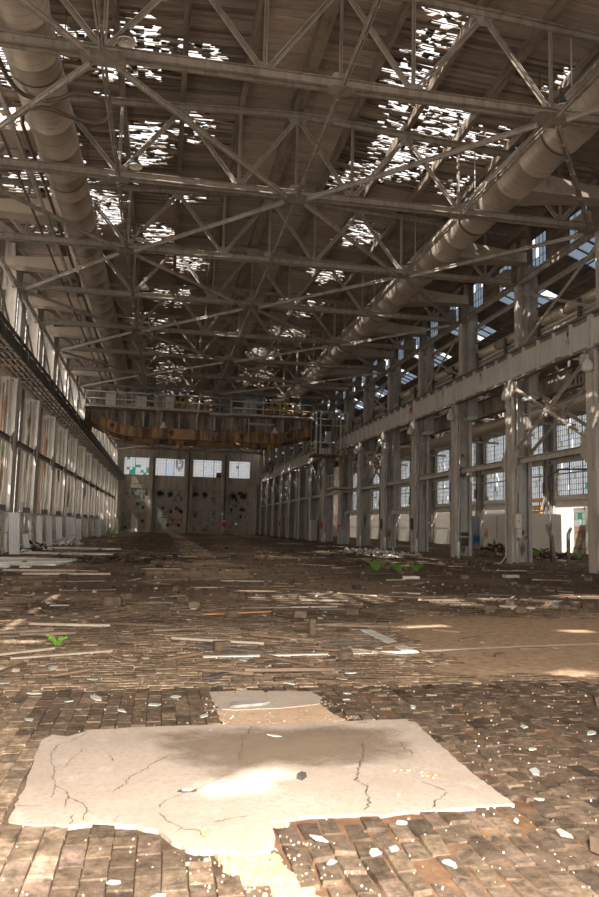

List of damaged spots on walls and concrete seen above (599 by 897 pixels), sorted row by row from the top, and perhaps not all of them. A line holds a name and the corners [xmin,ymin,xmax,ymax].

crack [17,733,116,823]
crack [354,742,372,810]